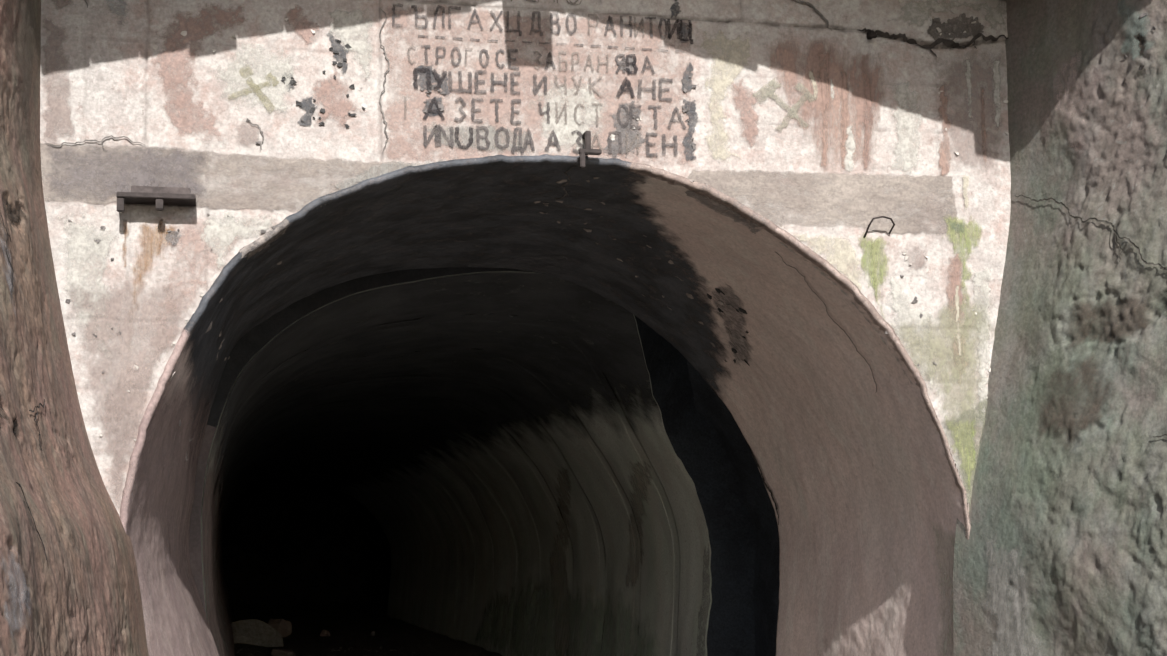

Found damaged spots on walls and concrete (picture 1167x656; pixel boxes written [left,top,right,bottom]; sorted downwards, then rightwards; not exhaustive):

peeling [281,7,366,128]
crack [795,0,1008,57]
crack [1016,195,1167,271]
water stain [630,162,991,540]
water stain [64,214,219,656]
water stain [986,542,1041,656]